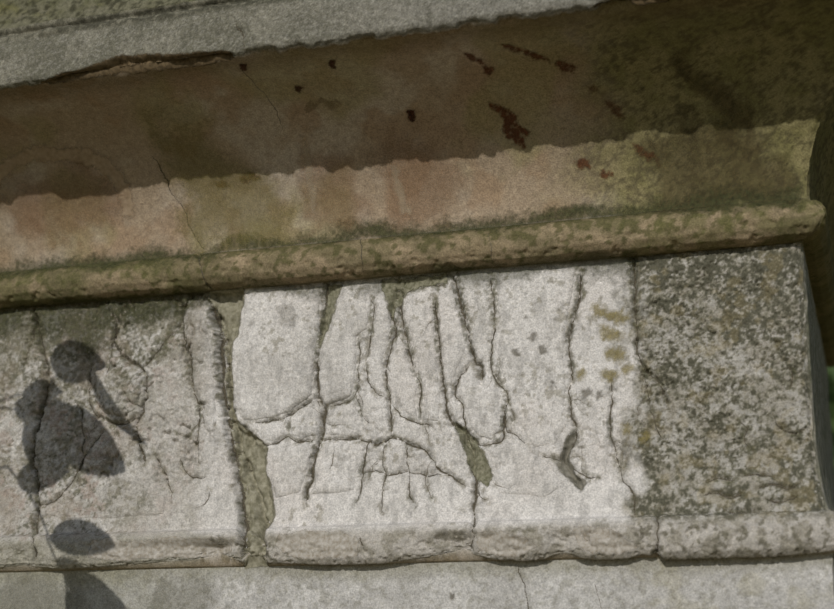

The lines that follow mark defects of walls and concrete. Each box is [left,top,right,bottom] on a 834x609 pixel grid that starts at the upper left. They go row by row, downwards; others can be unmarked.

spalling [39,50,235,85]
rust [489,103,530,148]
rust [502,44,575,72]
spalling [88,536,232,561]
crack [22,156,522,558]
spalling [209,284,359,569]
crack [544,274,596,479]
crack [609,383,640,513]
crack [633,266,668,439]
crack [703,474,800,514]